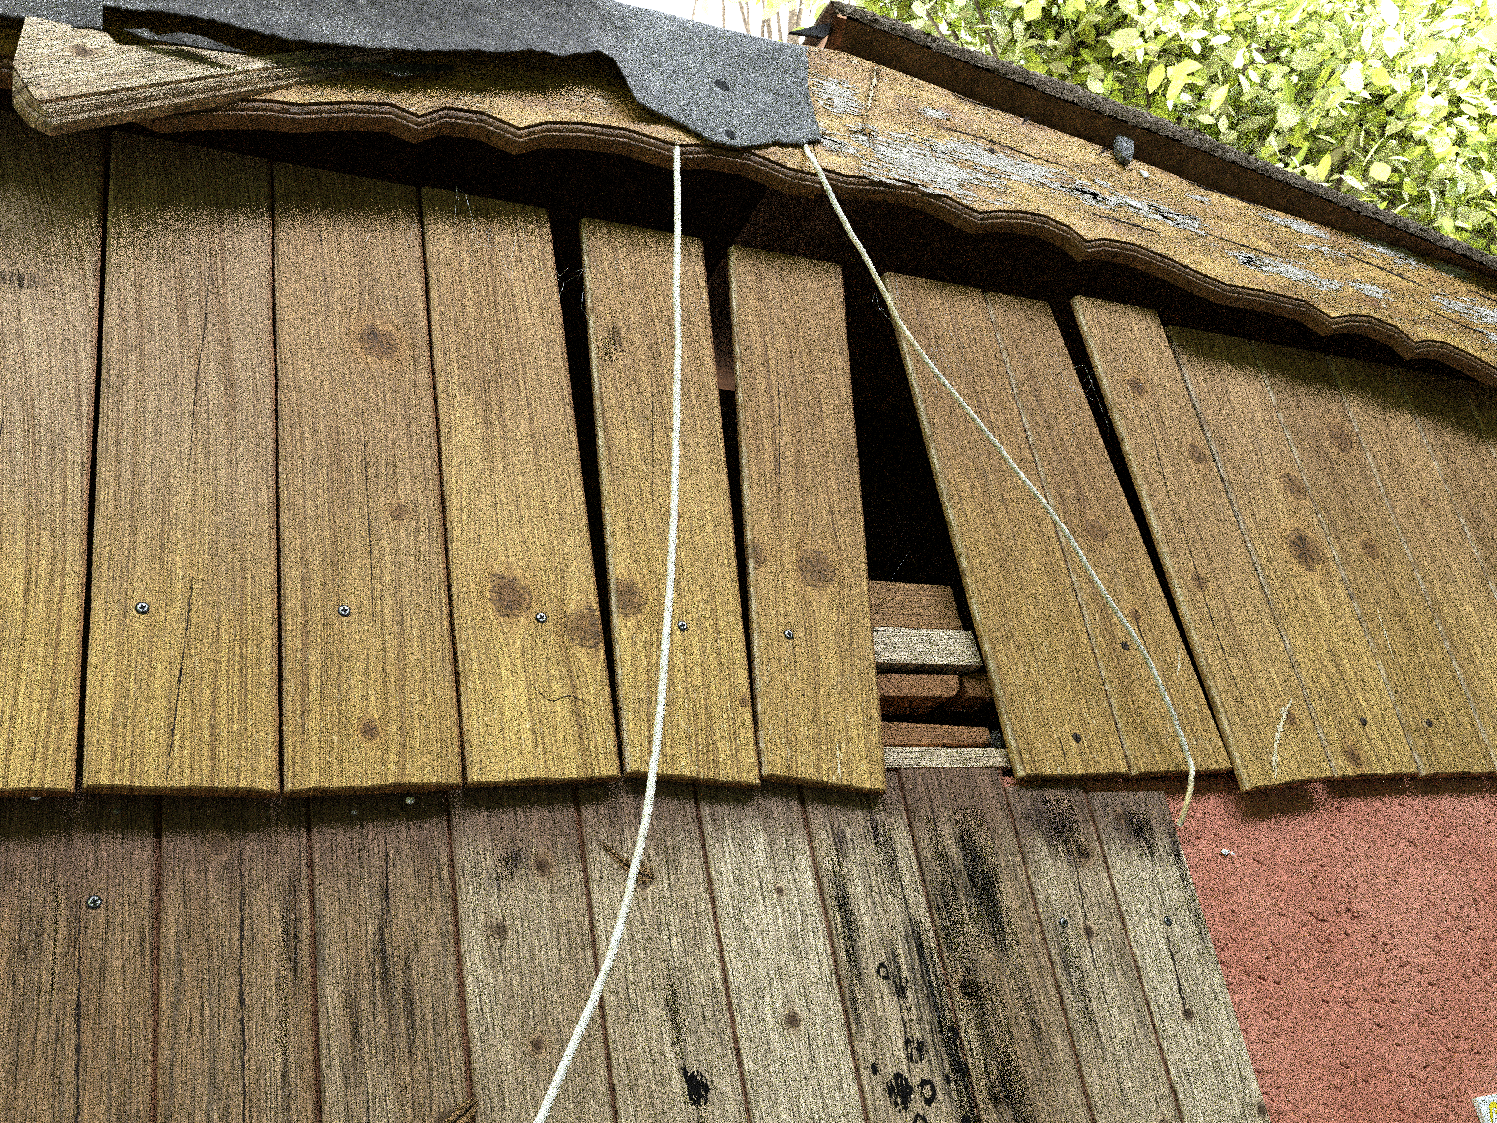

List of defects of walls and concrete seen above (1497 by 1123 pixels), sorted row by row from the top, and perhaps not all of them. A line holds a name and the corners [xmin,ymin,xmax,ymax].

crack [188,262,211,470]
peeling [1224,211,1497,344]
crack [166,577,193,781]
water stain [932,830,1008,960]
water stain [885,901,976,1123]
water stain [963,962,1029,1123]